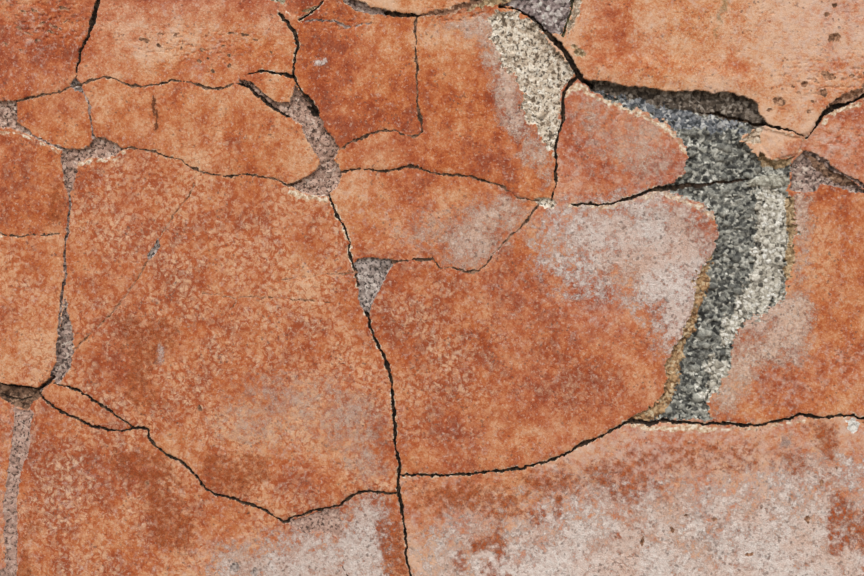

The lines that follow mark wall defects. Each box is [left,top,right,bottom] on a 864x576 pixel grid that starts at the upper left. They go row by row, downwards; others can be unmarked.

flaking render [343,0,387,16]
flaking render [239,80,342,197]
crack [16,0,749,274]
flaking render [420,0,586,156]
crack [699,93,864,188]
flaking render [806,70,864,113]
flaking render [354,257,393,313]
flaking render [534,197,556,209]
flaking render [586,79,864,422]
flaking render [0,299,74,576]
crack [0,194,864,576]